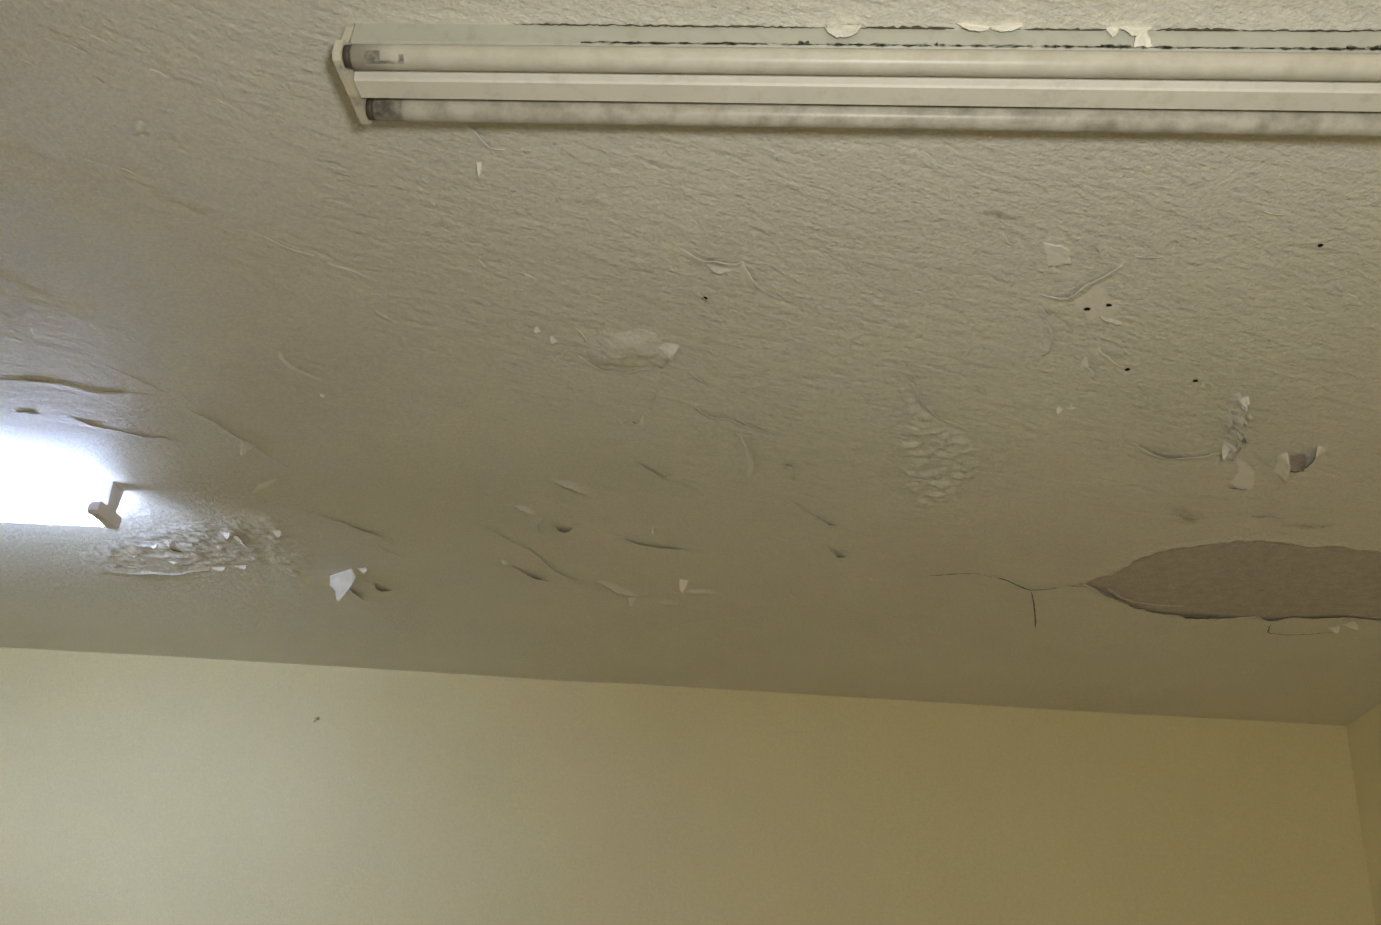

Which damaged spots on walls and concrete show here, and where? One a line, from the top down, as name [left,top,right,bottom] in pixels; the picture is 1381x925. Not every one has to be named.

flaking render [77,513,320,599]
peeling [330,567,367,603]
crack [931,573,1084,629]
spalling [1078,534,1381,622]